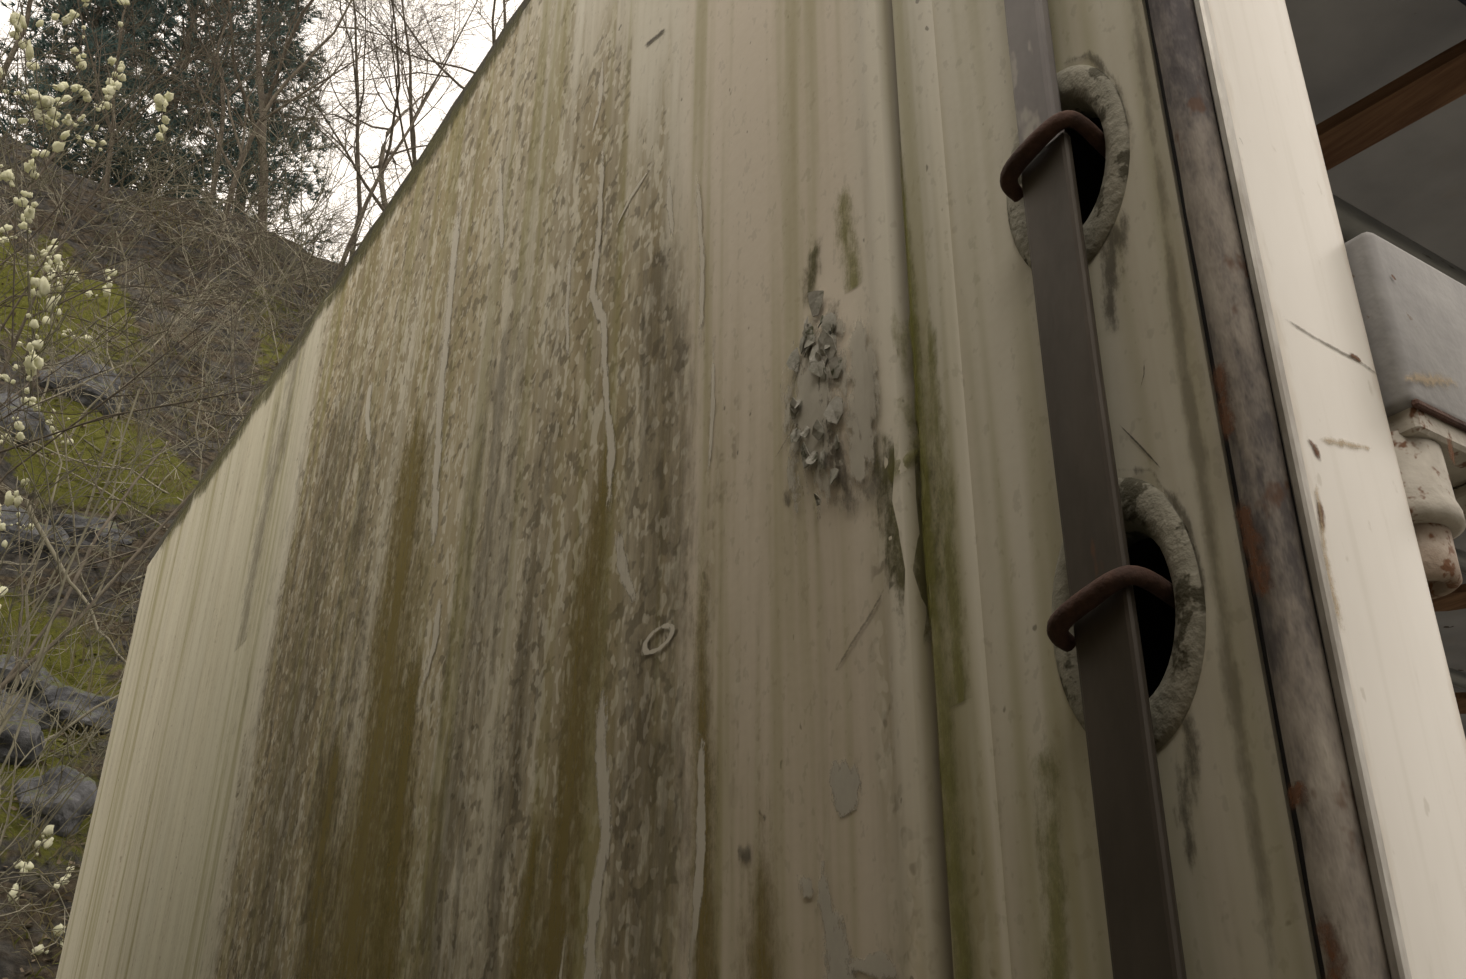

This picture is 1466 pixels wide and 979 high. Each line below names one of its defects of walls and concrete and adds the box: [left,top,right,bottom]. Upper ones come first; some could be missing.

water stain [431,202,462,568]
water stain [589,59,654,506]
water stain [807,246,818,297]
spalling [780,290,880,512]
water stain [840,197,857,289]
water stain [615,532,635,603]
water stain [944,490,964,704]
water stain [296,743,345,979]
water stain [380,600,441,979]
water stain [511,827,540,979]
water stain [559,690,613,979]
water stain [688,739,706,979]